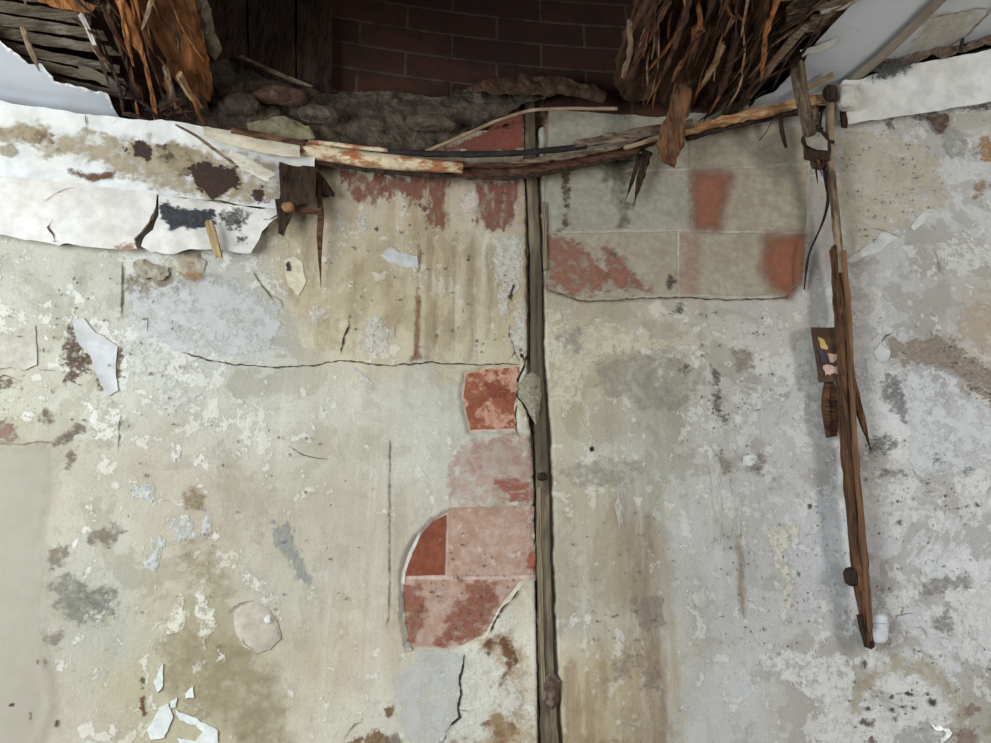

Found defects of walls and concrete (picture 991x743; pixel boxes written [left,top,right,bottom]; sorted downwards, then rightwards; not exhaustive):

flaking render [76,64,126,95]
flaking render [913,112,949,134]
flaking render [884,35,991,66]
crack [183,218,802,726]
flaking render [0,447,51,743]
peeling [159,587,225,662]
flaking render [403,477,536,649]
peeling [154,664,163,693]
peeling [147,687,218,743]
crack [439,654,465,743]
peeling [446,650,522,740]
rust [480,633,524,743]